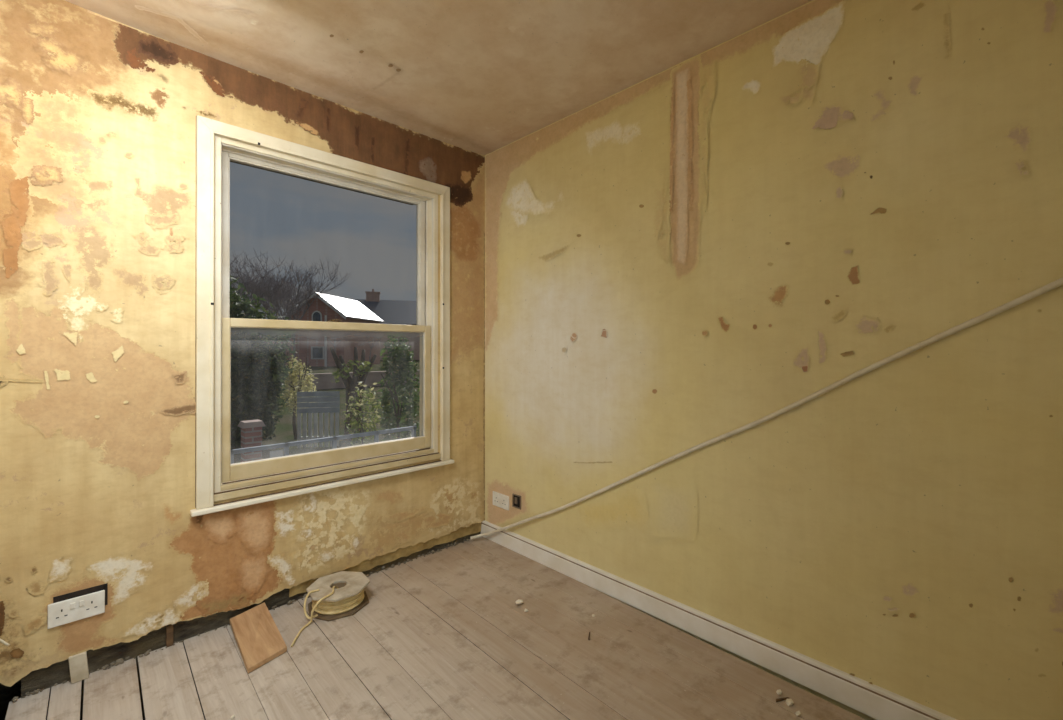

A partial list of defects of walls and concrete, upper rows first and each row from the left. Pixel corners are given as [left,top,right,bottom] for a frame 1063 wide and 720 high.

flaking render [700,0,853,70]
spalling [181,106,218,118]
flaking render [0,0,196,481]
flaking render [450,63,683,369]
spalling [160,500,284,621]
peeling [291,485,376,580]
peeling [421,473,530,539]